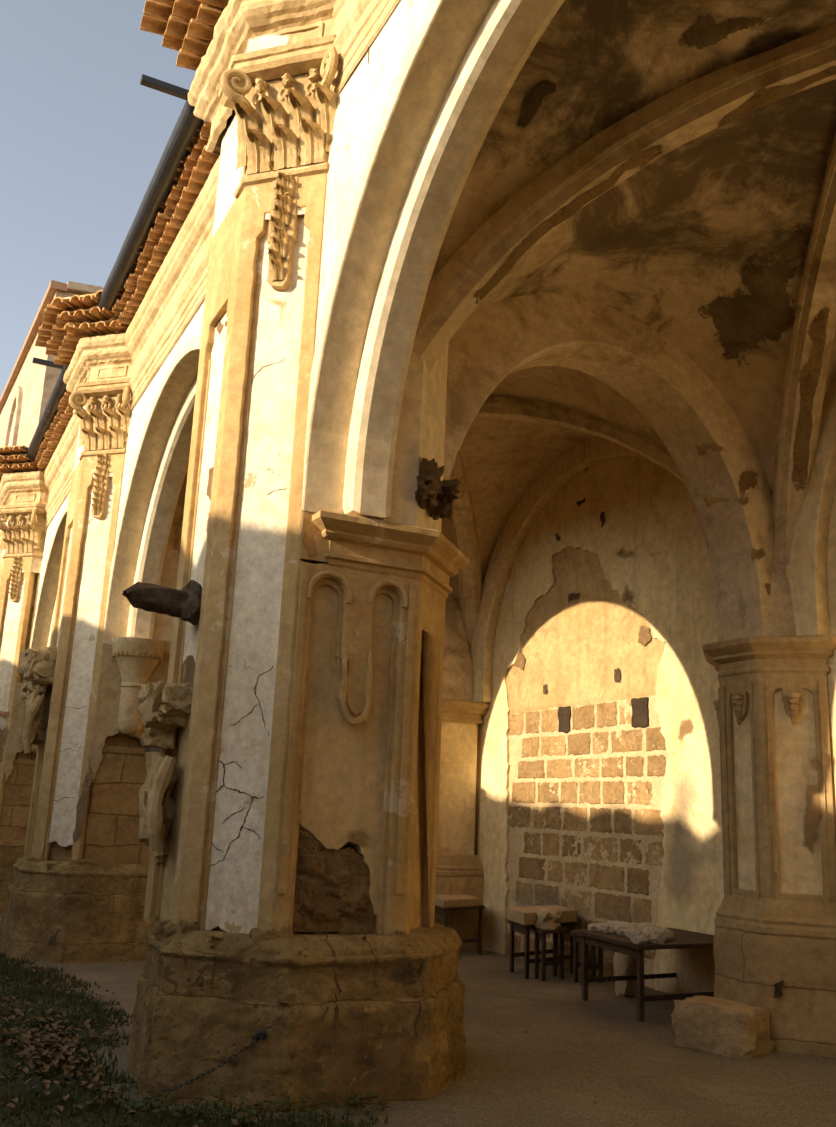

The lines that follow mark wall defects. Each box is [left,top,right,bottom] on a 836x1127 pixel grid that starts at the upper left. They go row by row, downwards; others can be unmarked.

crack [231,666,273,736]
flaking render [0,726,36,839]
flaking render [73,746,150,864]
crack [211,761,264,866]
flaking render [506,534,669,977]
water stain [804,784,822,852]
spalling [292,827,377,934]
flaking render [644,950,656,989]